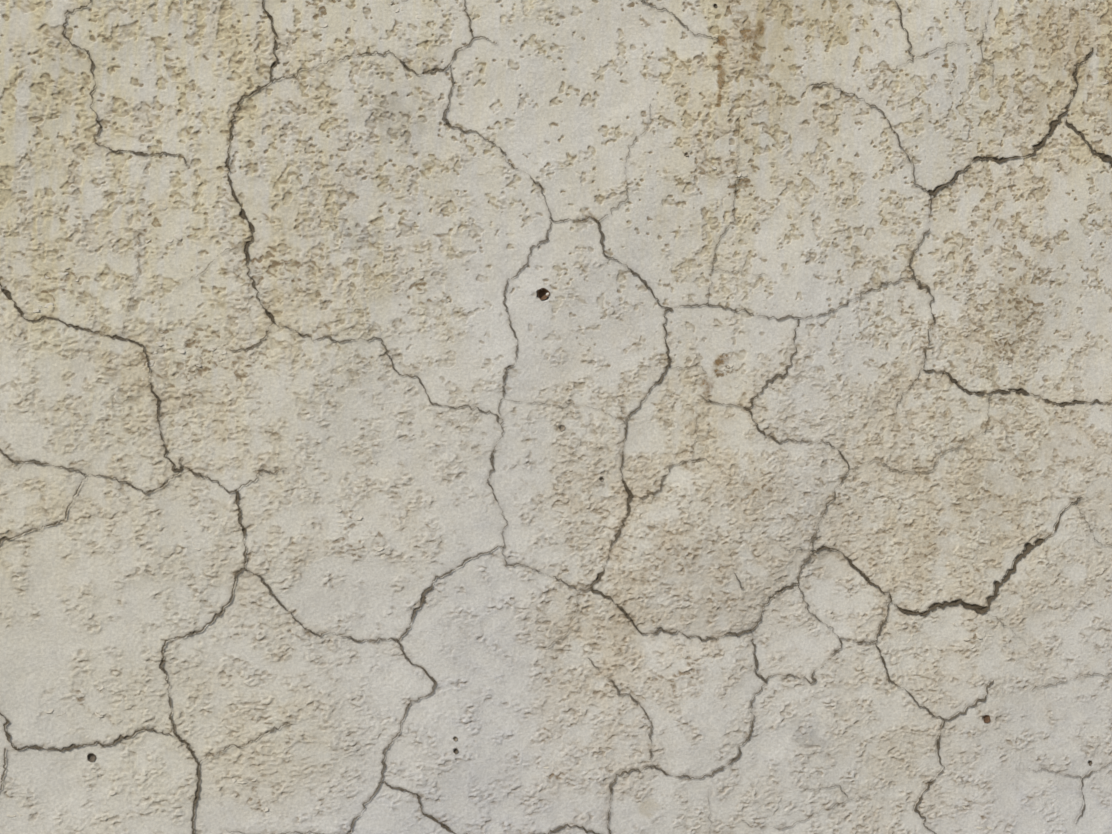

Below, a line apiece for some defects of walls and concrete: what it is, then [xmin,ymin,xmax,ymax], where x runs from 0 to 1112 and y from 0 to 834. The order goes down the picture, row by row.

crack [62,0,186,164]
crack [0,284,326,834]
crack [225,0,1112,834]